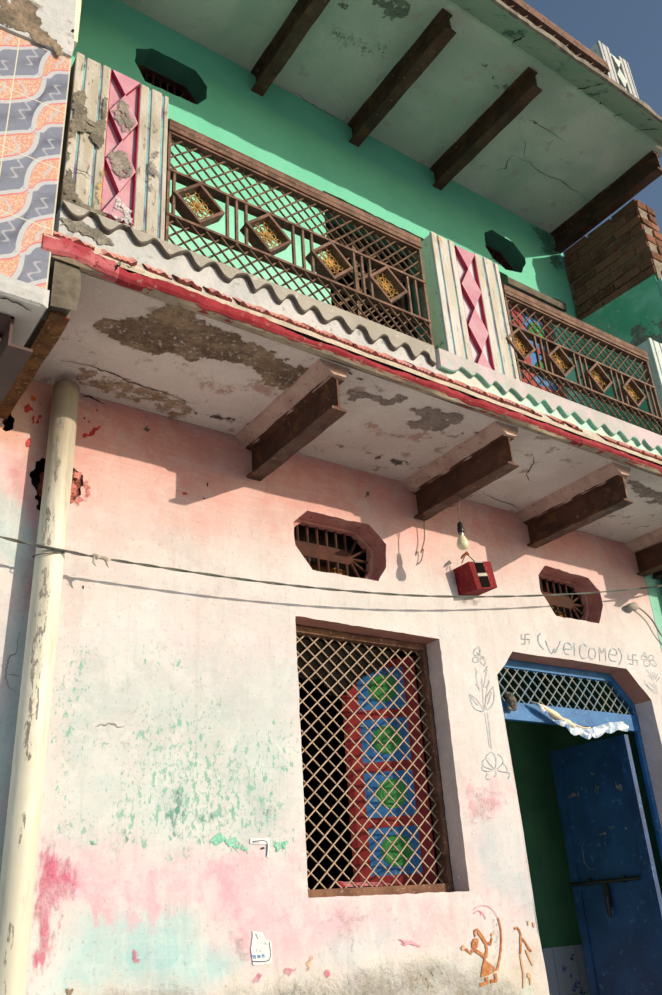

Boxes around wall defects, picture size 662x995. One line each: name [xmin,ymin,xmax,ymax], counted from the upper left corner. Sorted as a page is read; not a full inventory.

peeling [0,0,63,56]
peeling [62,90,136,217]
crack [498,120,588,201]
spalling [60,217,114,245]
peeling [93,303,309,391]
peeling [347,390,479,435]
hole [30,463,45,511]
spalling [70,469,91,505]
peeling [627,480,662,505]